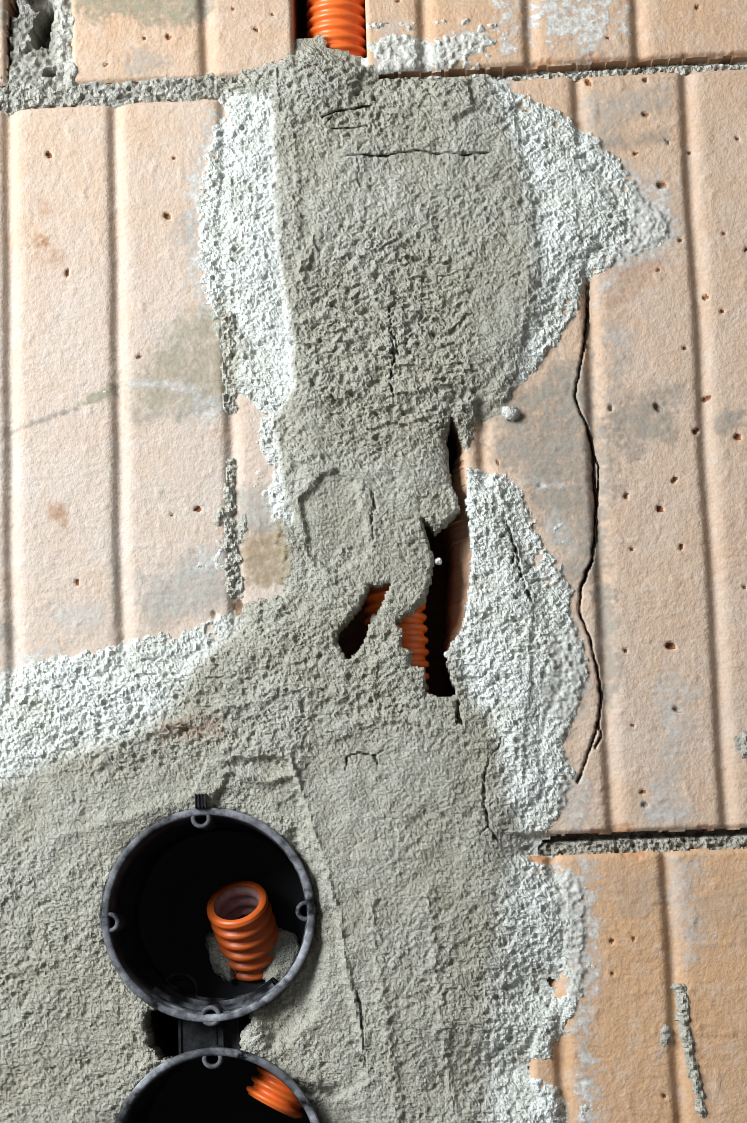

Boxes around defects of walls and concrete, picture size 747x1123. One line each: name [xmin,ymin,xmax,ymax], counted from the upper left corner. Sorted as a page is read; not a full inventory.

crack [321,104,486,157]
hole [444,417,464,487]
crack [575,282,602,781]
spalling [335,583,391,659]
hole [395,499,473,697]